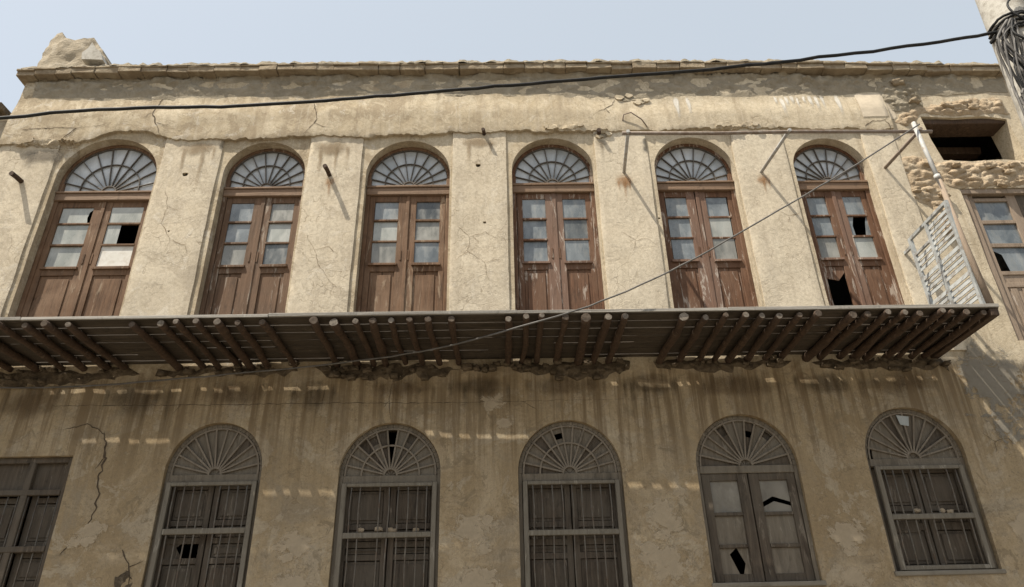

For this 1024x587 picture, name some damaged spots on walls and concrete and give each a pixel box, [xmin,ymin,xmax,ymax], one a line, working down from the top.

spalling [32,72,1010,126]
crack [53,385,656,554]
spalling [114,571,132,587]